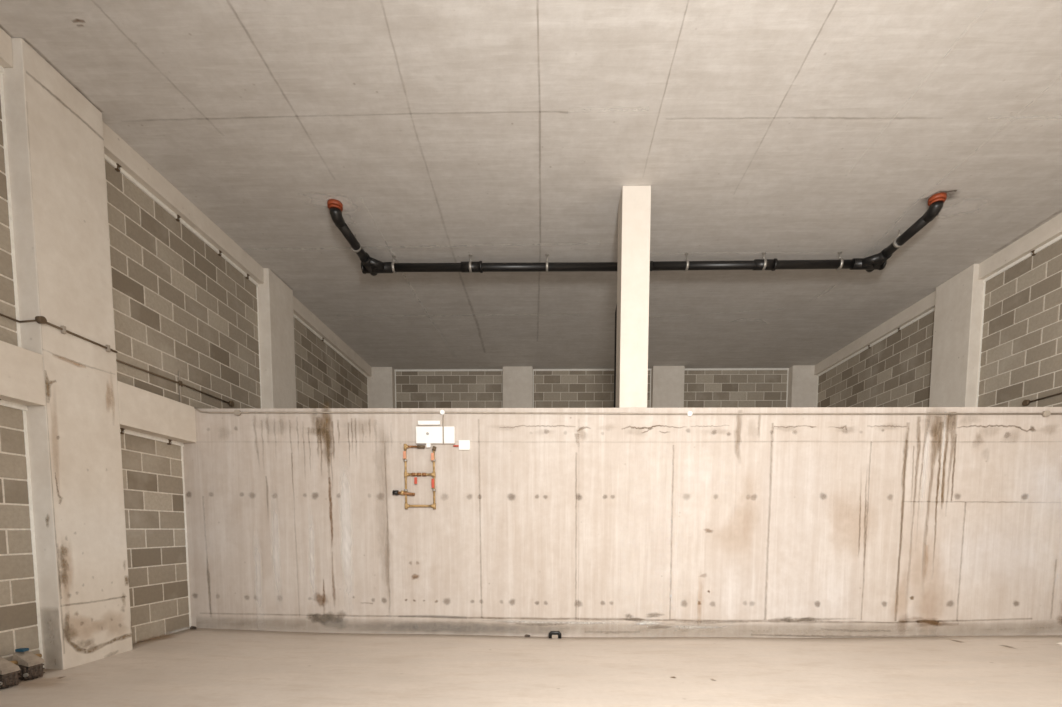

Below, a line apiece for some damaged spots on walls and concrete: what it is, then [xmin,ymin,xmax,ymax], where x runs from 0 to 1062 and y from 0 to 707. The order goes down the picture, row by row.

damp [317,410,330,437]
damp [905,420,955,509]